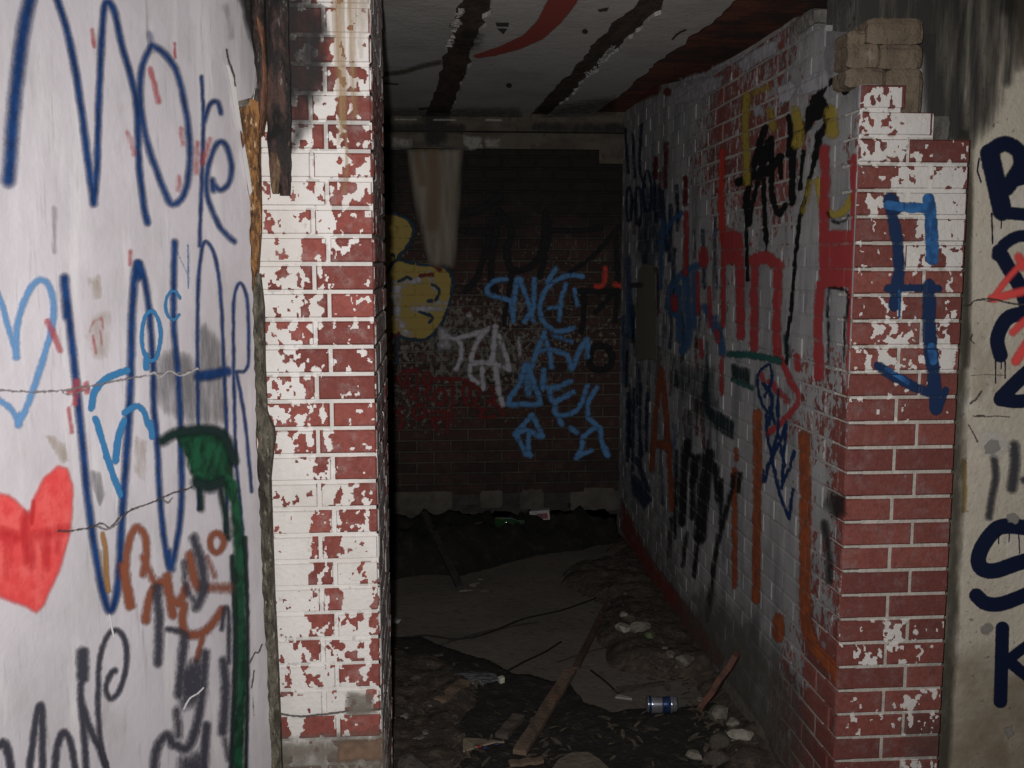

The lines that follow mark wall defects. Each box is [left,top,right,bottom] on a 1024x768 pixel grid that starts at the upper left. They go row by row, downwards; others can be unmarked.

corrosion [335,0,353,134]
peeling [670,41,777,106]
peeling [777,18,968,423]
peeling [226,0,382,766]
peeling [839,618,944,666]
peeling [870,688,940,736]
peeling [899,759,937,768]